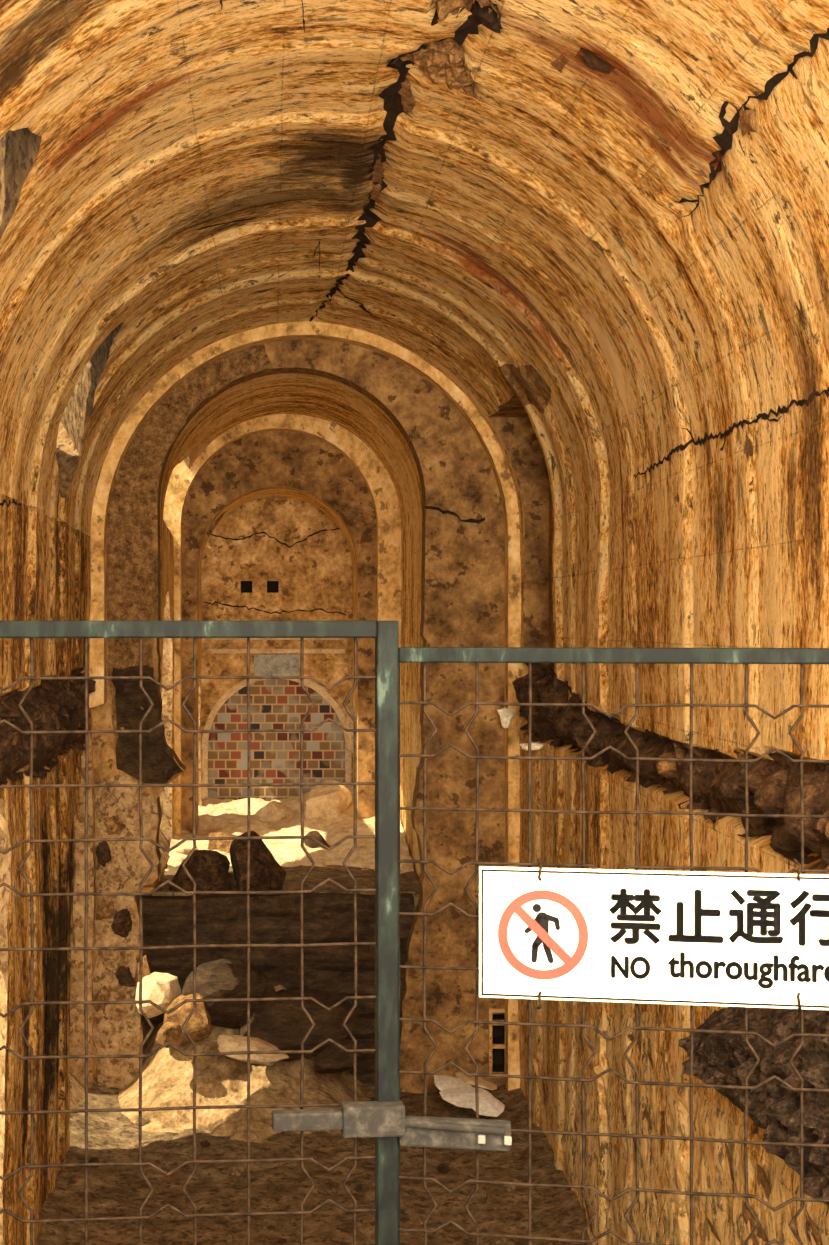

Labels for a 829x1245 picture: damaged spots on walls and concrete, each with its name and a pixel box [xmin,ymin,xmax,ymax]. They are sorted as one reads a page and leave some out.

crack [310,4,502,322]
spalling [390,0,503,97]
crack [675,28,829,221]
crack [0,499,22,507]
spalling [107,344,271,621]
spalling [498,364,551,414]
crack [633,387,829,478]
peeling [0,638,183,1089]
spalling [513,663,829,869]
peeling [557,1007,829,1245]